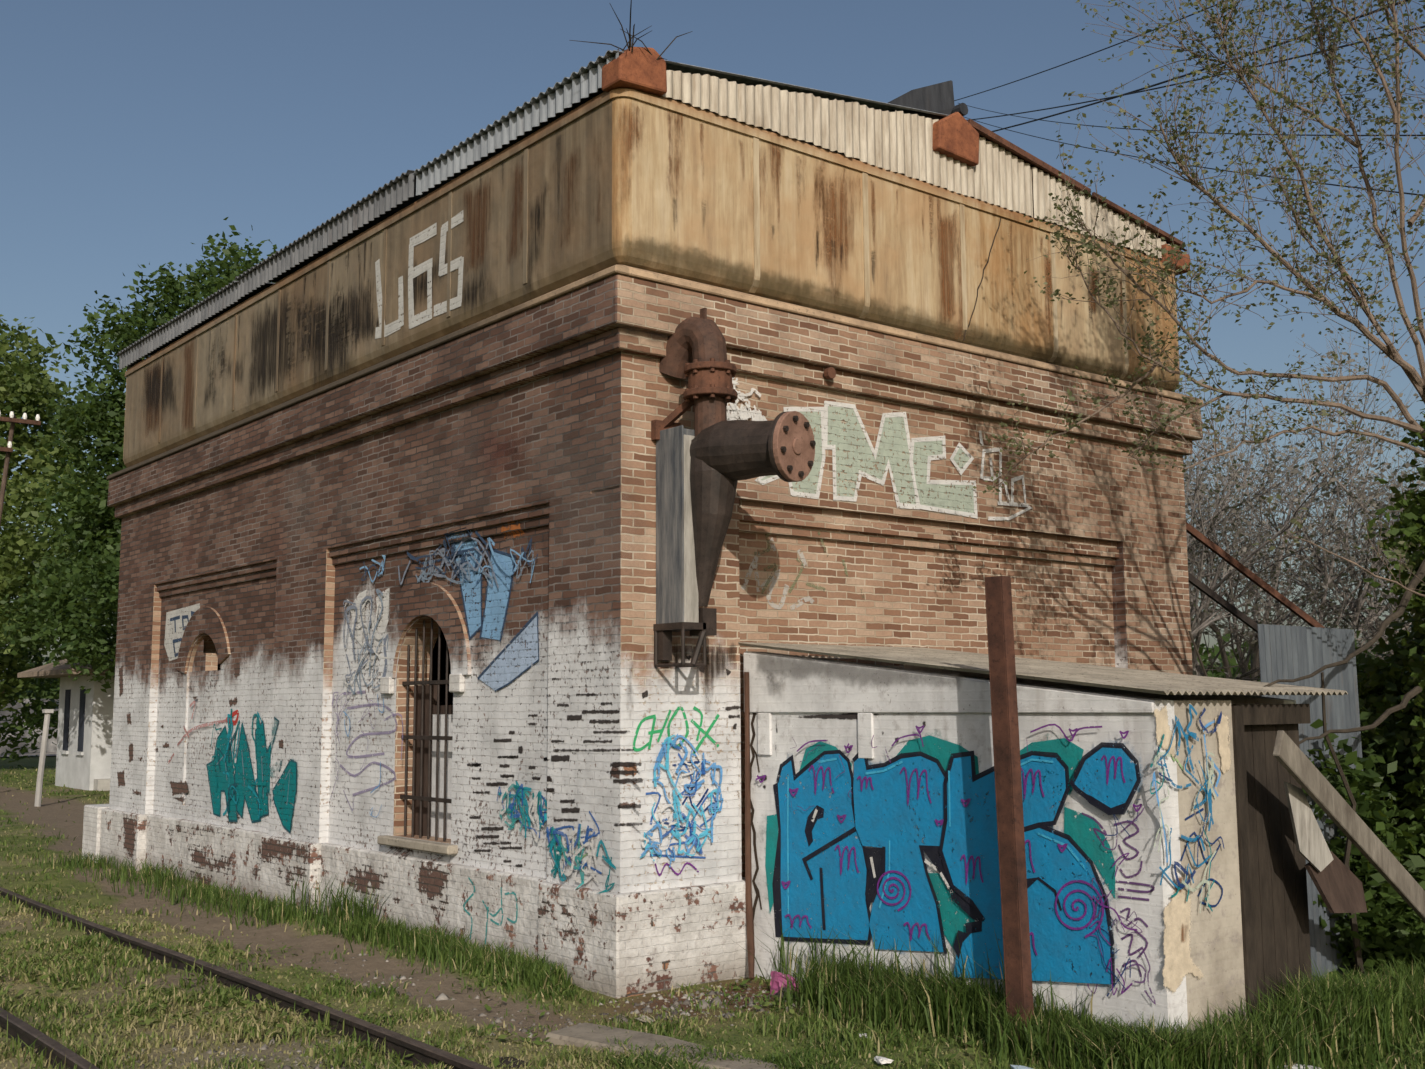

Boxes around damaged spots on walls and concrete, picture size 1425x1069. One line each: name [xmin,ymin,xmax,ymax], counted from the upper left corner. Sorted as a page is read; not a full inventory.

rust [815,170,848,275]
water stain [413,266,436,300]
rust [929,196,962,320]
water stain [206,242,378,399]
water stain [144,368,174,410]
peeling [1215,714,1231,773]
peeling [123,811,136,860]
peeling [167,813,240,885]
peeling [252,836,320,886]
peeling [347,859,400,920]
peeling [385,846,450,916]
peeling [1162,889,1204,992]